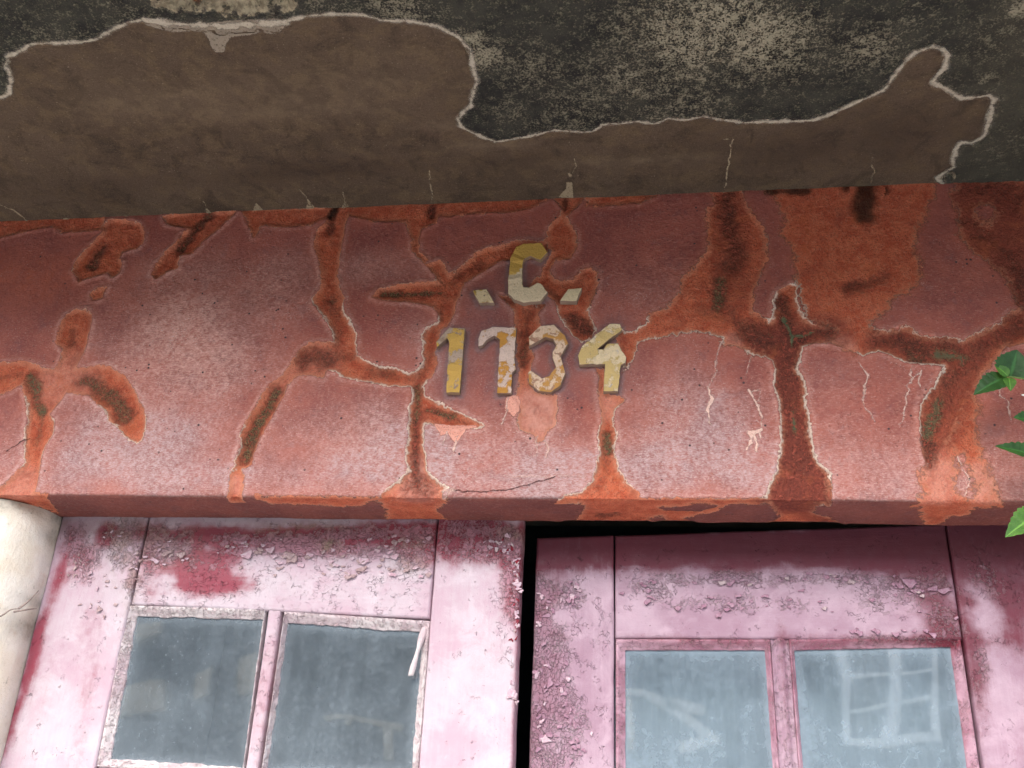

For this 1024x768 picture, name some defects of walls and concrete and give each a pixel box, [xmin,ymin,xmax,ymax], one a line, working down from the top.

spalling [150,0,298,18]
crack [227,139,1024,502]
peeling [103,530,189,580]
peeling [217,534,432,580]
peeling [892,575,953,598]